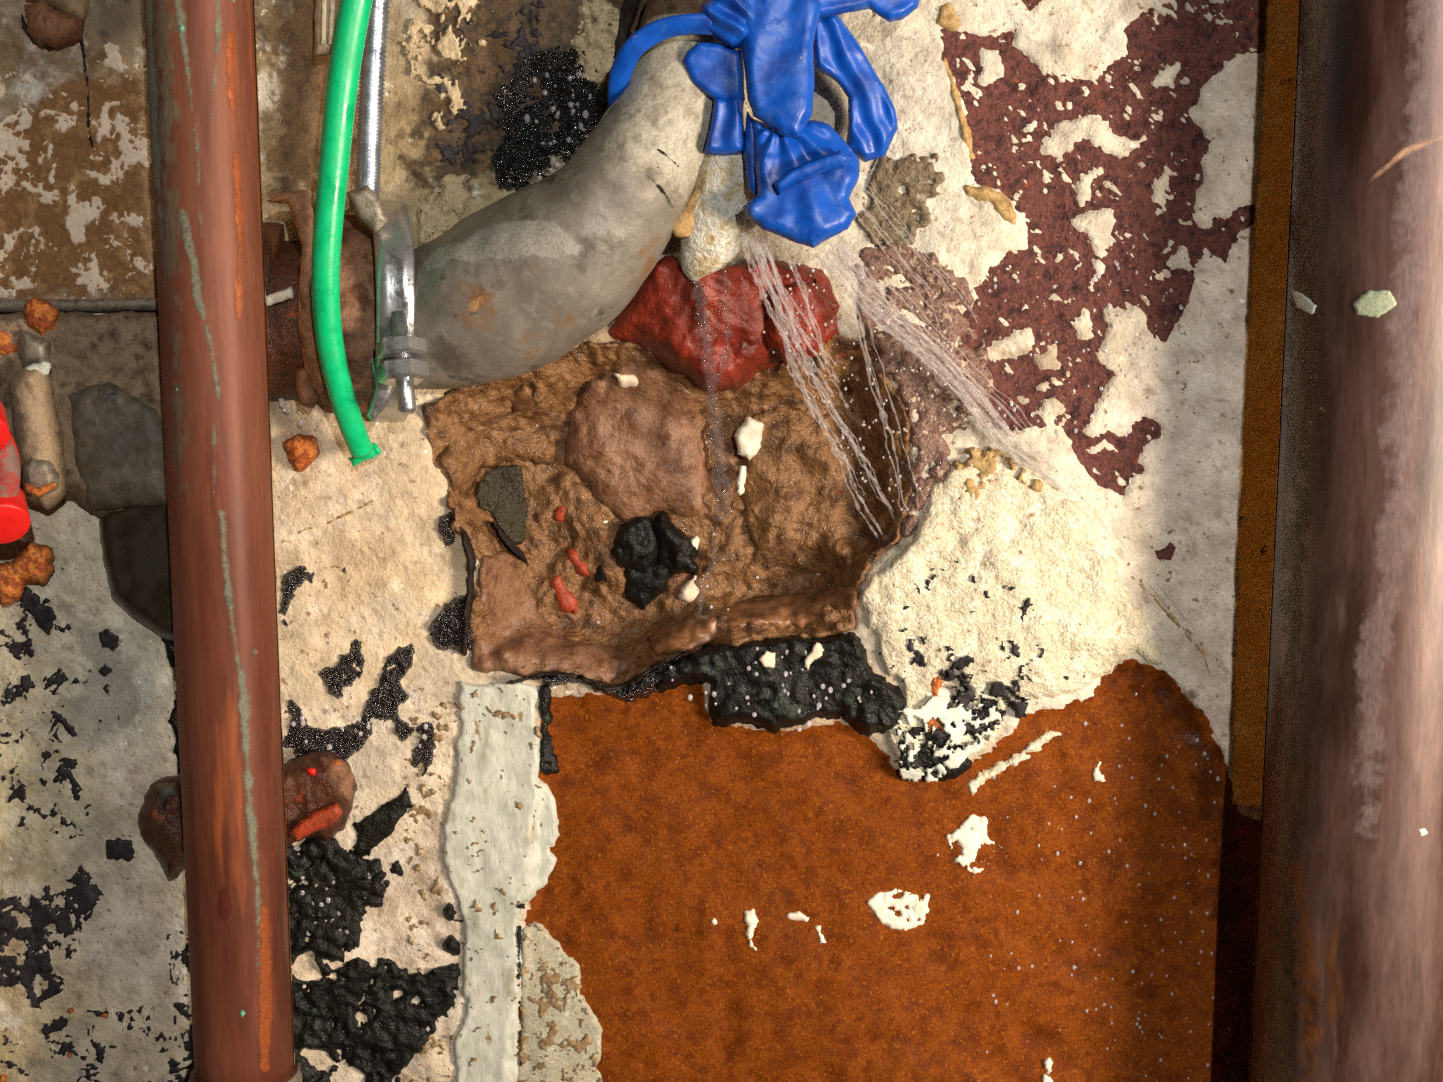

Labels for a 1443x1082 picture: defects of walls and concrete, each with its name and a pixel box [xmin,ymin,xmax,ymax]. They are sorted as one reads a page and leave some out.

peeling [0,42,155,299]
water stain [399,0,608,194]
water stain [0,586,138,839]
water stain [278,565,315,626]
water stain [283,639,437,777]
water stain [428,594,473,653]
water stain [538,0,1325,1082]
corrosion [926,718,944,732]
corrosion [930,677,942,696]
corrosion [951,446,1043,500]
water stain [0,865,194,1082]
water stain [287,787,461,1082]